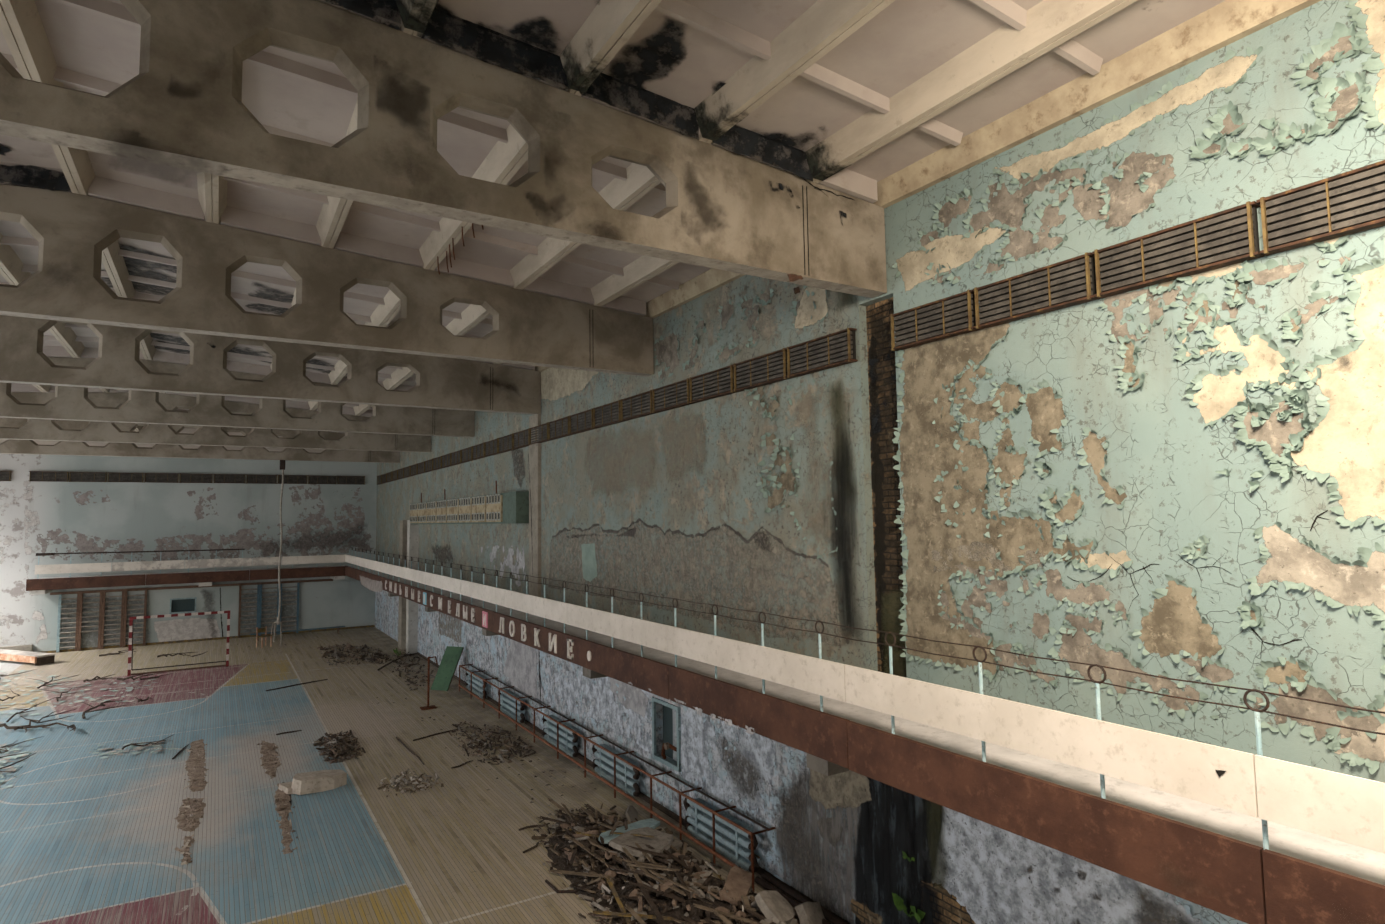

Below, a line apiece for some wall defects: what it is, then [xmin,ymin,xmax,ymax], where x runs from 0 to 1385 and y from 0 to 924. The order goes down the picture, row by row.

water stain [324,0,846,182]
peeling [892,0,1385,292]
peeling [154,618,221,642]
peeling [36,484,376,562]
peeling [359,575,383,592]
water stain [548,387,857,648]
peeling [892,234,1385,774]
peeling [922,806,1204,924]